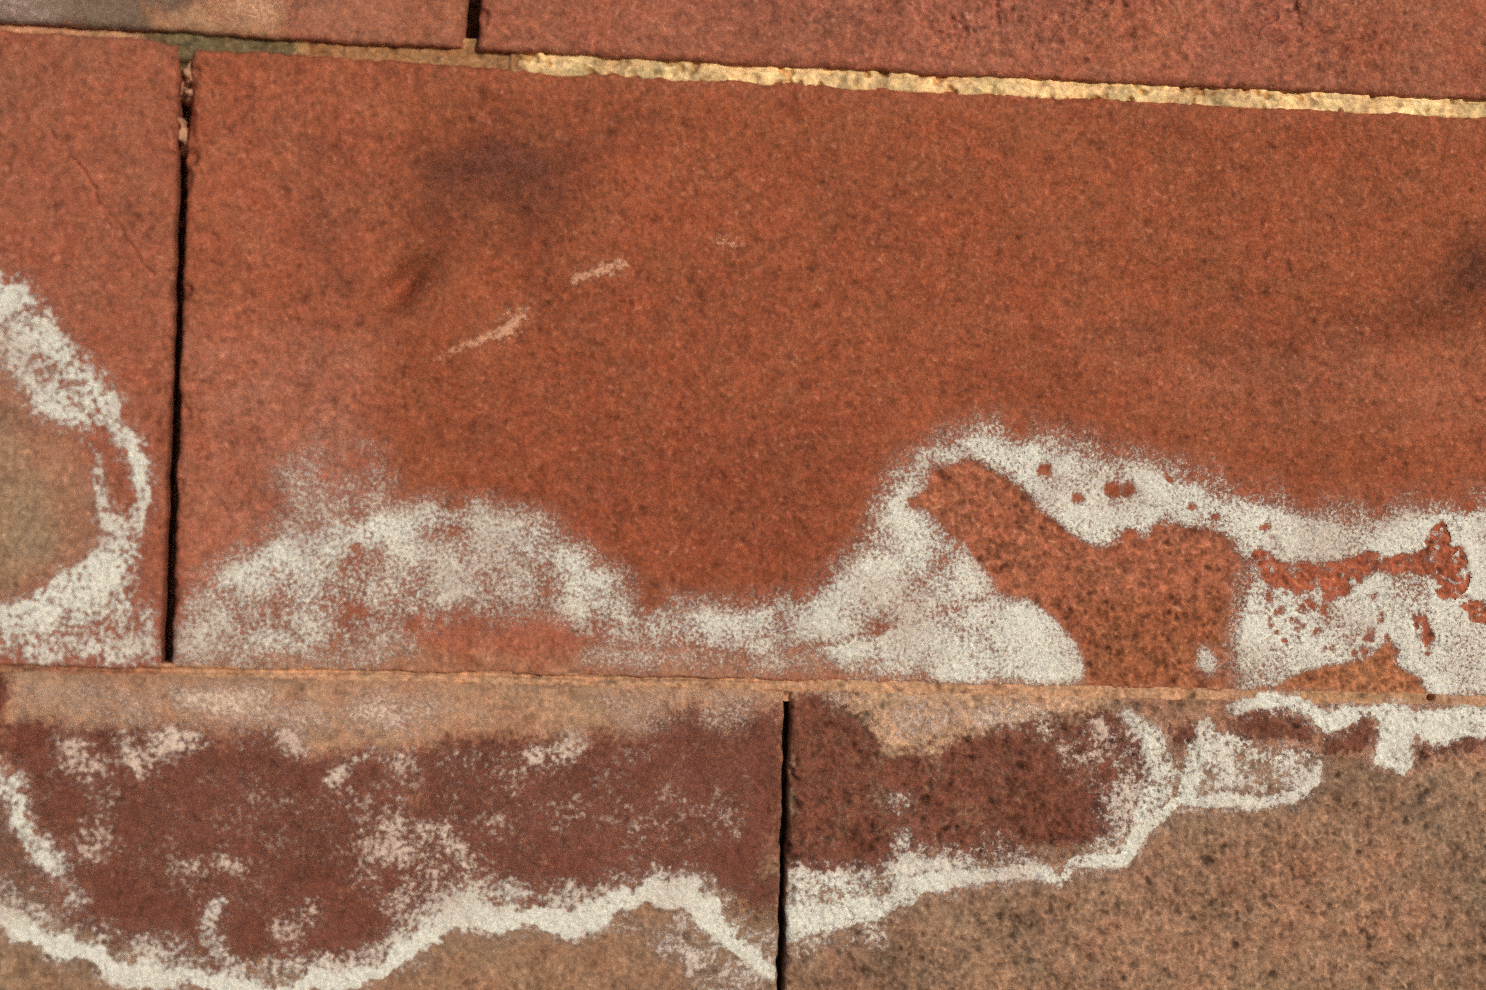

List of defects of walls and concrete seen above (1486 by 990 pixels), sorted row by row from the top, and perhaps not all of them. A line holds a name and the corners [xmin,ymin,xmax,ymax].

leakage [0,0,191,30]
crack [924,0,1138,53]
crack [1250,0,1378,63]
leakage [571,258,629,285]
leakage [0,271,1486,990]